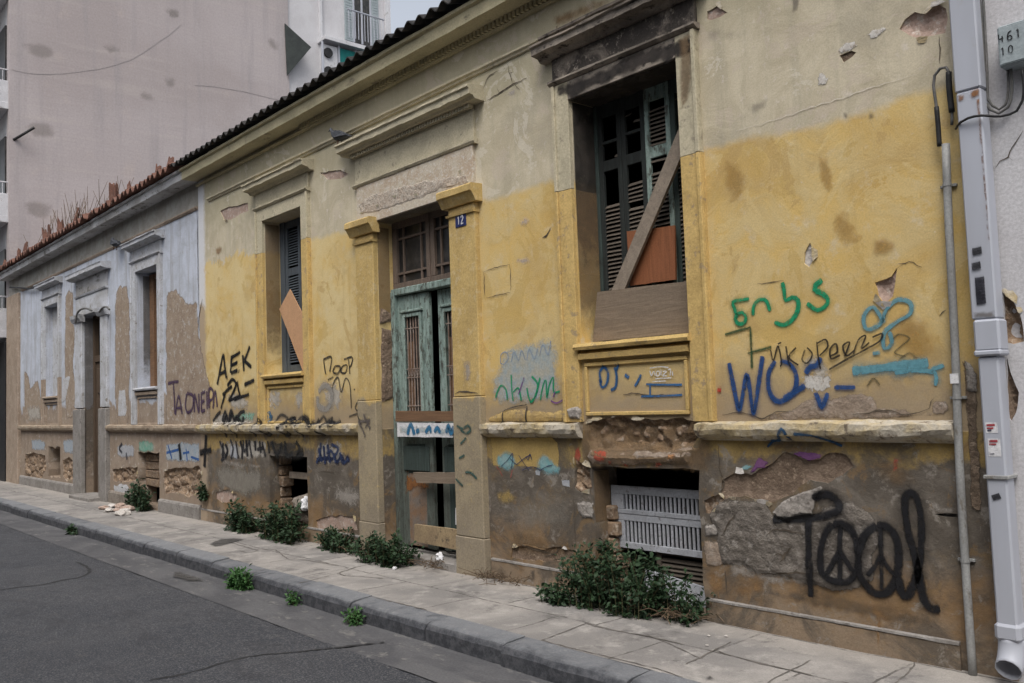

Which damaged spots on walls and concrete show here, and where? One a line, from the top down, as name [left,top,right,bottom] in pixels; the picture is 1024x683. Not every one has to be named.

flaking render [900,0,948,43]
peeling [838,41,857,62]
flaking render [221,203,249,222]
flaking render [805,244,818,267]
flaking render [873,270,897,309]
flaking render [1002,288,1024,344]
peeling [165,290,210,425]
flaking render [1005,362,1019,420]
flaking render [567,407,696,446]
flaking render [25,452,47,478]
flaking render [164,466,202,498]
flaking render [704,452,853,566]